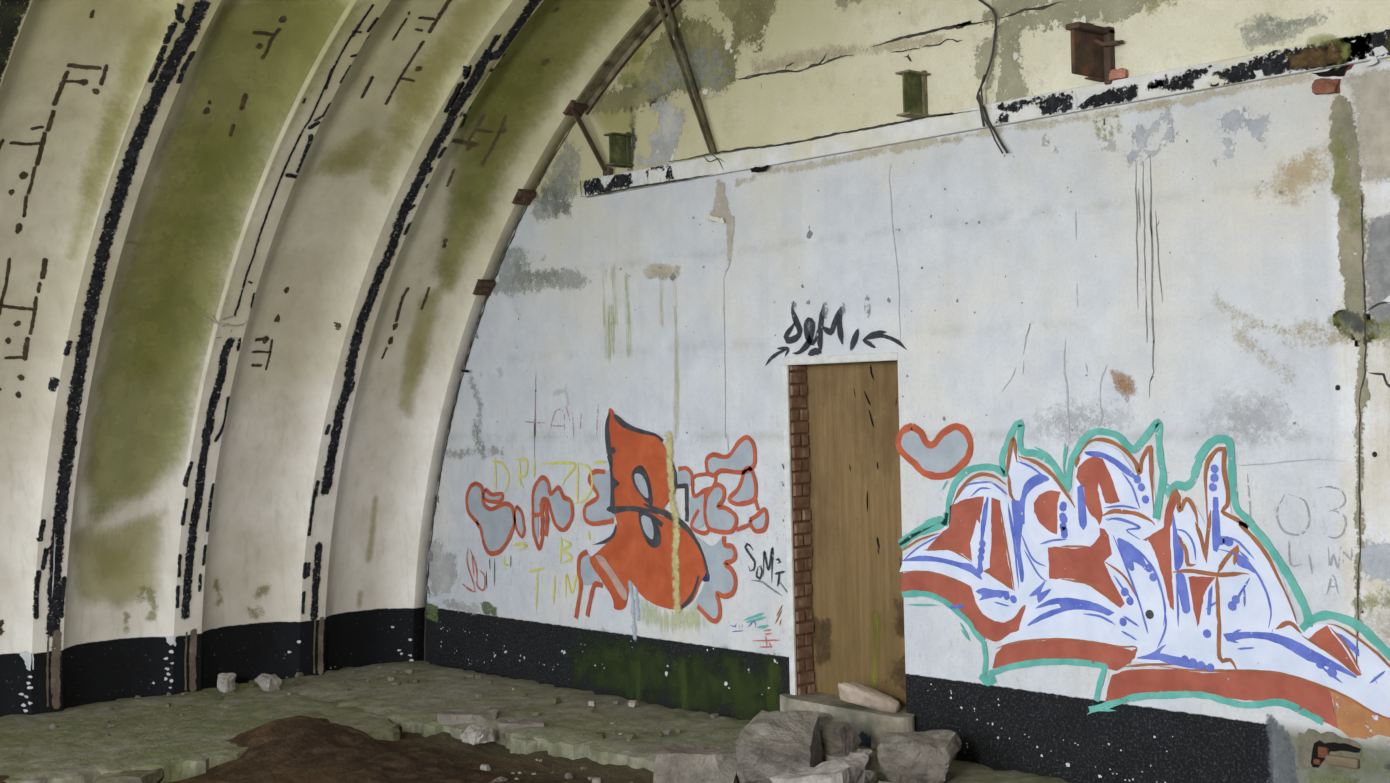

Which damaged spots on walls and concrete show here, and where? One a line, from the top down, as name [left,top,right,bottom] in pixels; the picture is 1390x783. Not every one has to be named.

flaking render [970,0,1390,180]
crack [1204,95,1390,664]